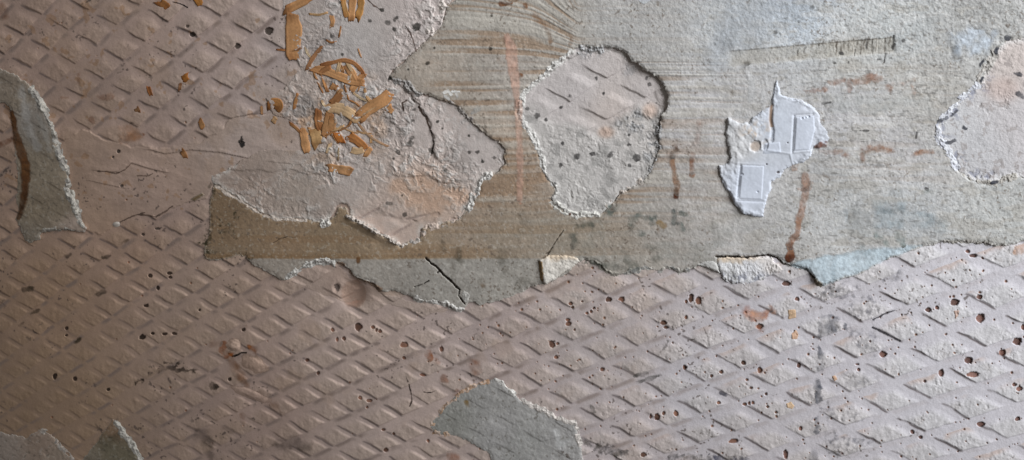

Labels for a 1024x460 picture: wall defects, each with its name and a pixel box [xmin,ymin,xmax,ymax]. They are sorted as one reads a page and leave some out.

spalling [27,85,85,232]
spalling [211,0,505,248]
crack [402,95,434,156]
spalling [517,45,668,220]
rust [670,147,694,199]
spalling [934,38,1024,188]
spalling [285,257,470,313]
crack [414,257,465,304]
flaking render [538,255,790,286]
rust [785,210,802,262]
spalling [943,239,993,257]
spalling [113,420,144,460]